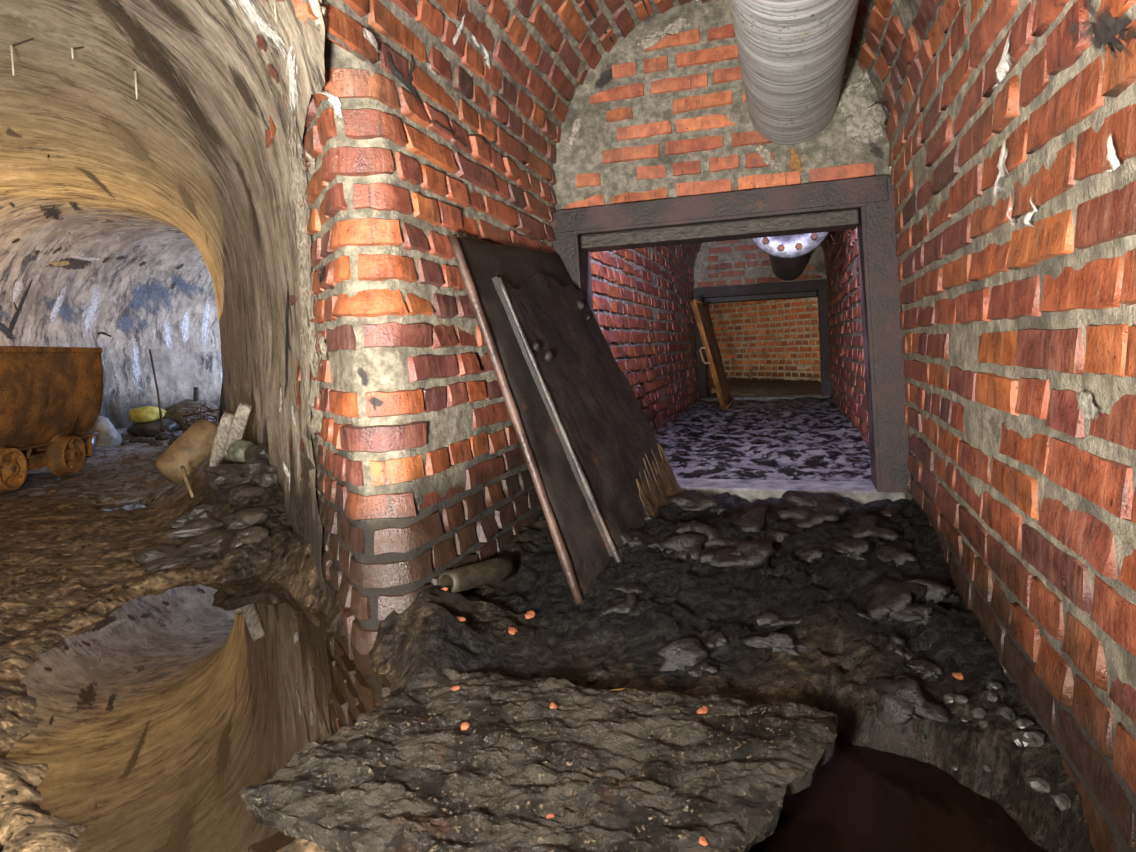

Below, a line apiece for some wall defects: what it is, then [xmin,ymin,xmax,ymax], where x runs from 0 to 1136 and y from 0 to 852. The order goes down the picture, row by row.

flaking render [256,35,278,84]